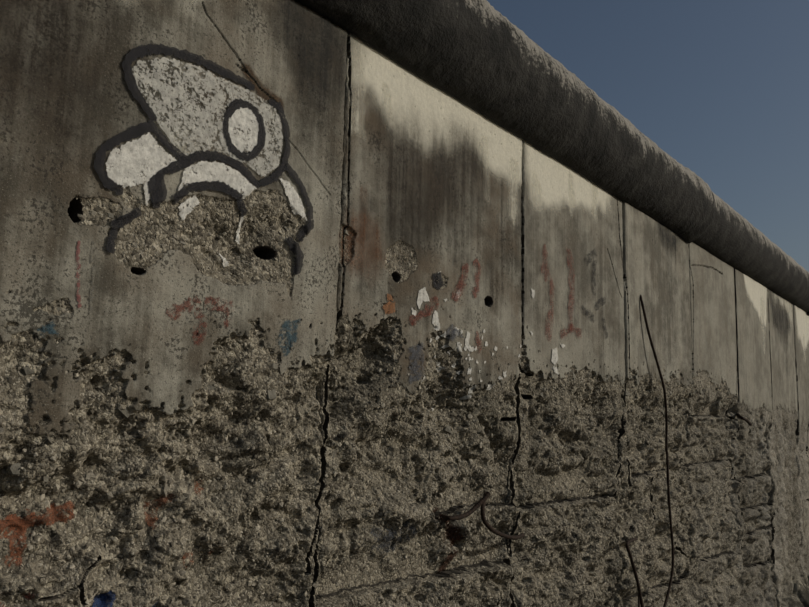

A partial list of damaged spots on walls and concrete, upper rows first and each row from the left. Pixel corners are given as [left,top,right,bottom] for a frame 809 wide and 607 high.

spalling [73,185,305,297]
crack [304,364,329,607]
crack [336,36,352,328]
spalling [339,224,357,265]
spalling [384,240,418,284]
spalling [0,293,809,607]
peeling [412,271,449,317]
leakage [278,0,612,236]
crack [506,178,533,557]